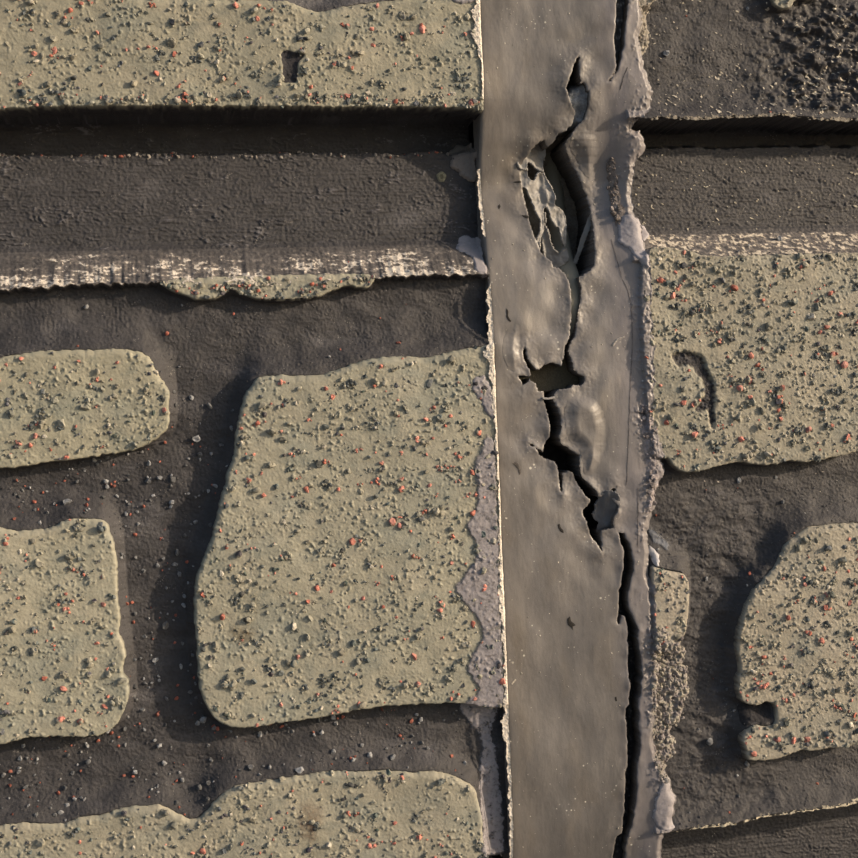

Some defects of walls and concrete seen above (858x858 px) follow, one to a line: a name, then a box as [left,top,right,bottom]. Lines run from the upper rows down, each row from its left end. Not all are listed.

crack [609,0,629,89]
crack [516,57,646,858]
spalling [649,626,689,784]